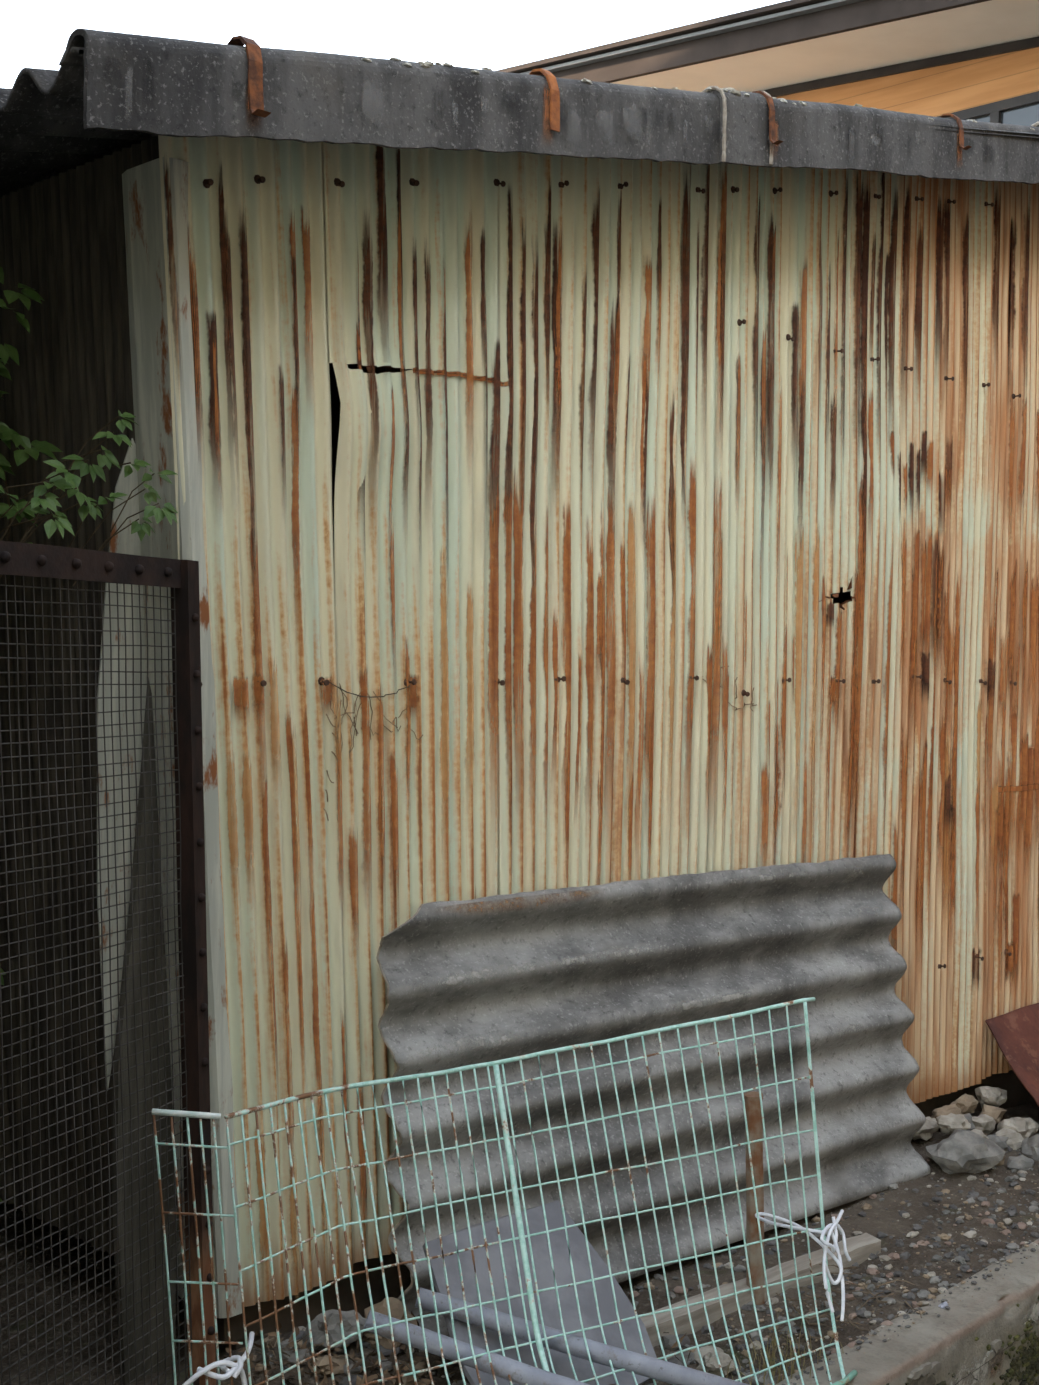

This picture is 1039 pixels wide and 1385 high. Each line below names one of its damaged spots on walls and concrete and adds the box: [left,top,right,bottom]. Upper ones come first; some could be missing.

rust [992,194,1030,365]
rust [322,146,969,932]
rust [1008,401,1039,507]
rust [975,562,1039,974]
rust [972,948,981,981]
rust [341,1018,367,1210]